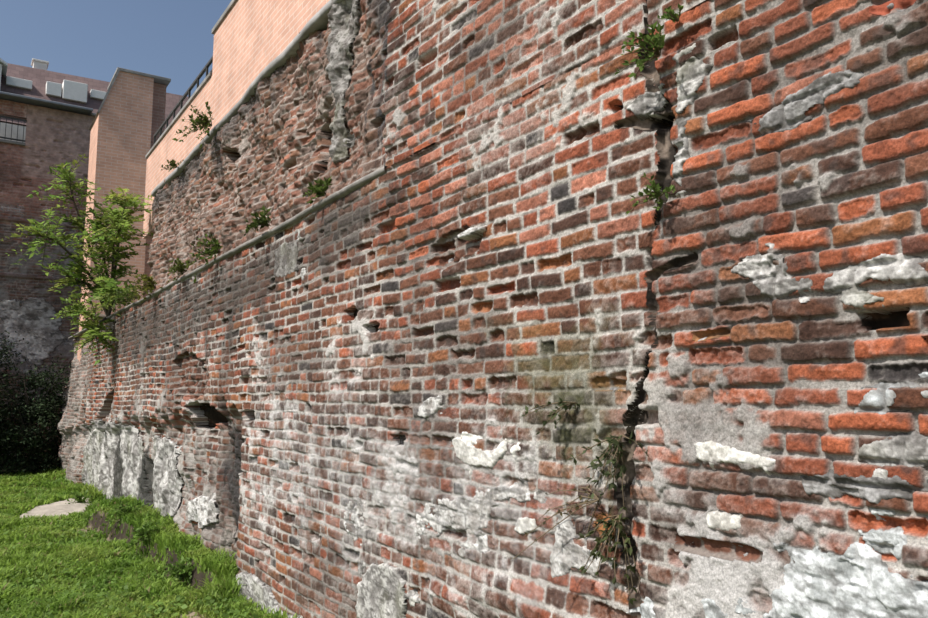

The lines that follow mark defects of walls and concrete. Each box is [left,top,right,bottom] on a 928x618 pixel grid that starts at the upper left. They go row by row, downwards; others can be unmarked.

peeling [842,72,865,89]
crack [614,0,677,227]
spalling [839,285,910,331]
spalling [175,352,229,429]
crack [614,252,698,618]
spalling [673,535,763,563]
peeling [700,508,928,618]
peeling [403,589,421,607]
peeling [626,597,656,618]